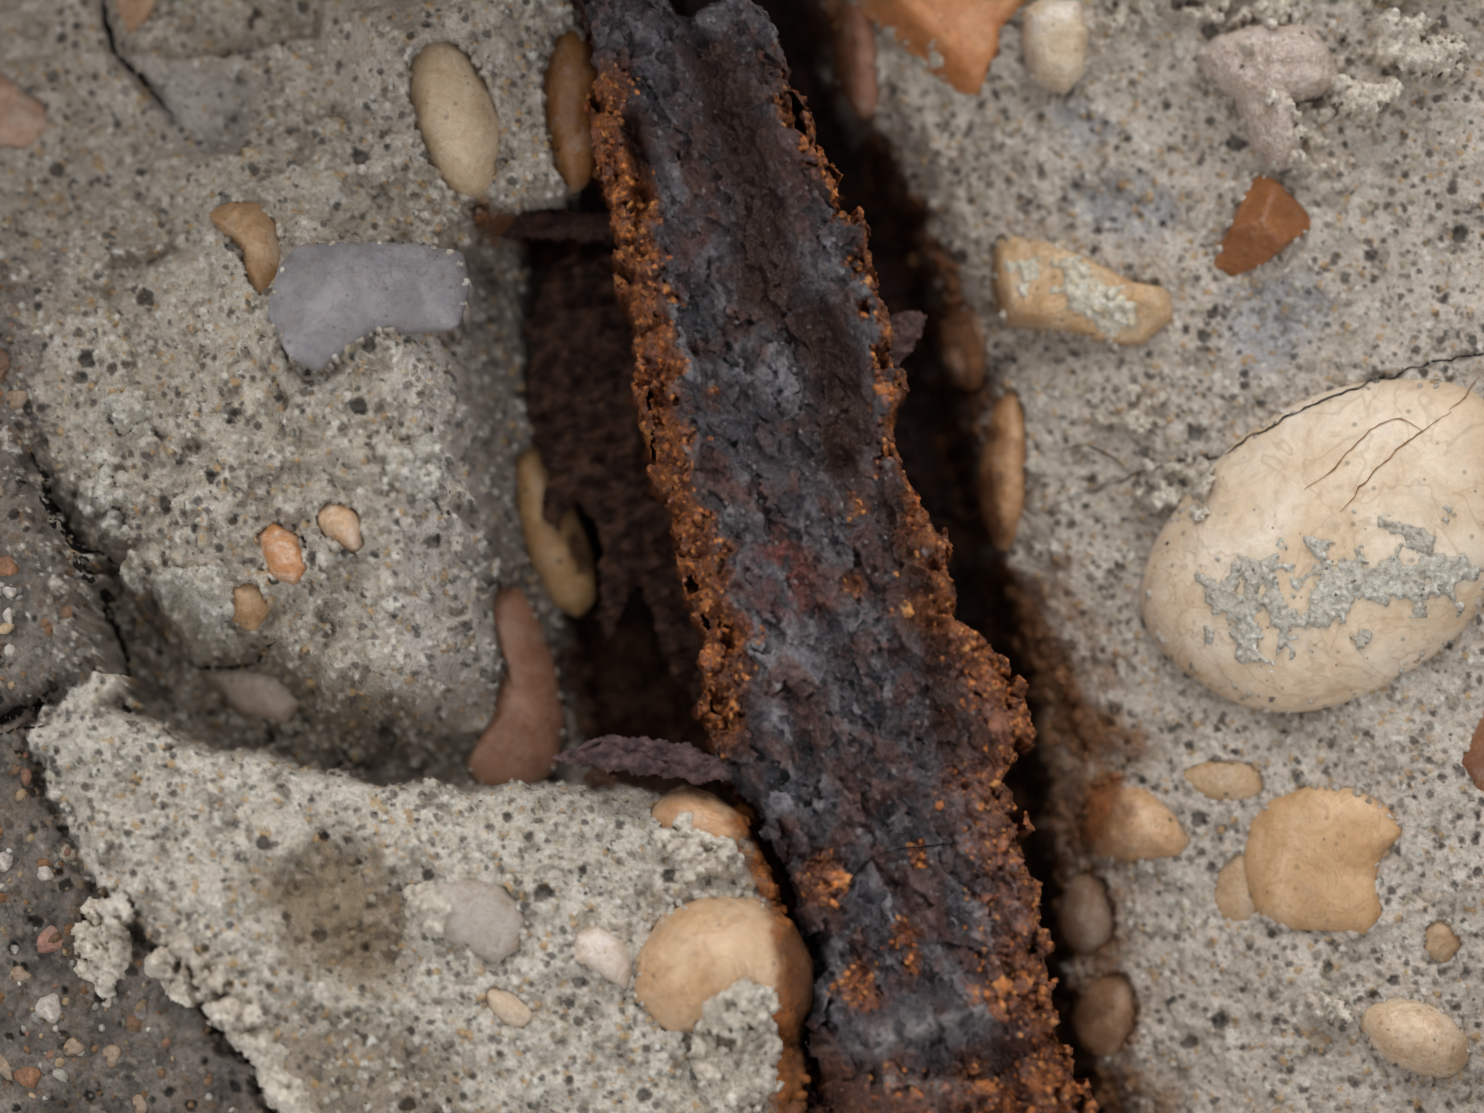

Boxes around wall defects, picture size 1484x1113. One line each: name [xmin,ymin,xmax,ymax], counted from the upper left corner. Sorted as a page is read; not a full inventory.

crack [0,688,58,735]
spalling [0,0,782,1113]
corrosion [472,35,766,756]
corrosion [583,767,818,1113]
corrosion [769,0,1171,1113]
crack [1050,353,1484,512]